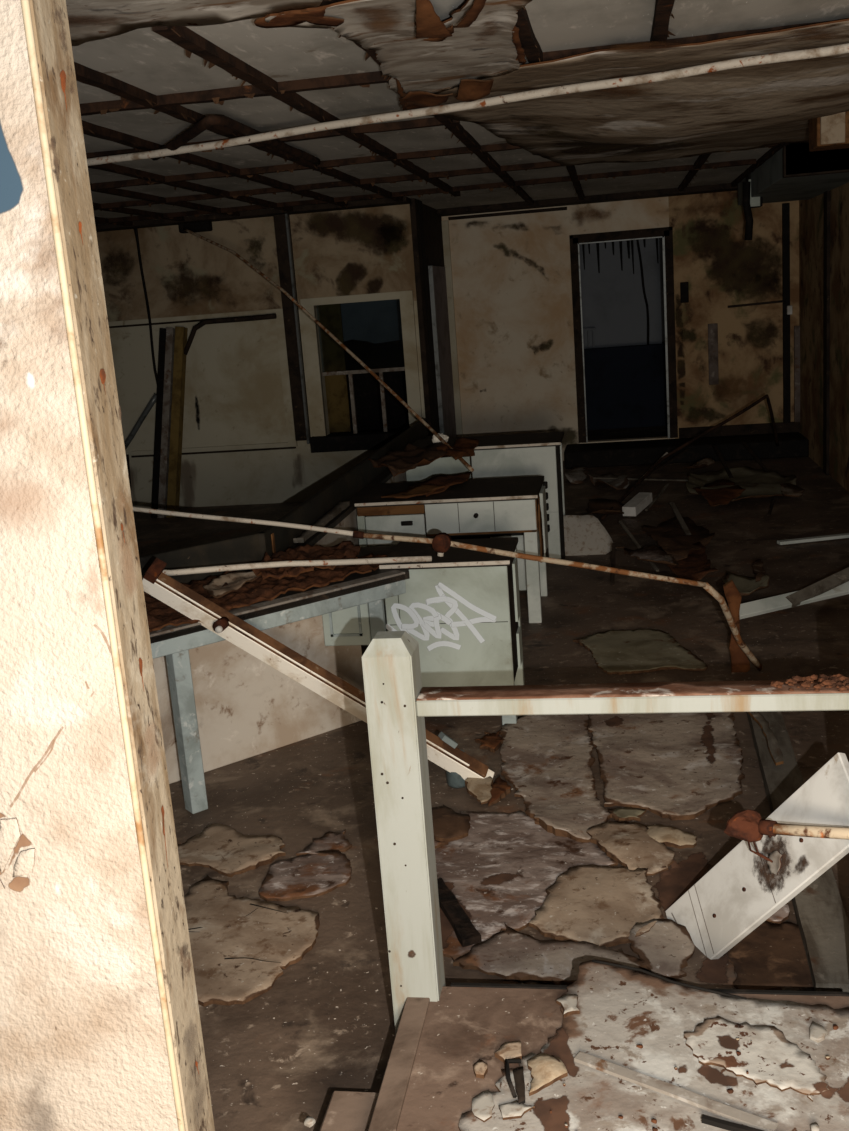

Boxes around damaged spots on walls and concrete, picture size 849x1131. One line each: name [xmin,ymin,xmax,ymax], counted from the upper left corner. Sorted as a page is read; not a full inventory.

water stain [308,212,407,255]
water stain [104,252,133,285]
water stain [165,267,221,301]
water stain [336,263,383,296]
water stain [690,208,783,299]
water stain [746,322,778,348]
water stain [676,295,741,421]
peeling [0,813,35,892]
peeling [767,851,783,875]
peeling [810,1021,839,1043]